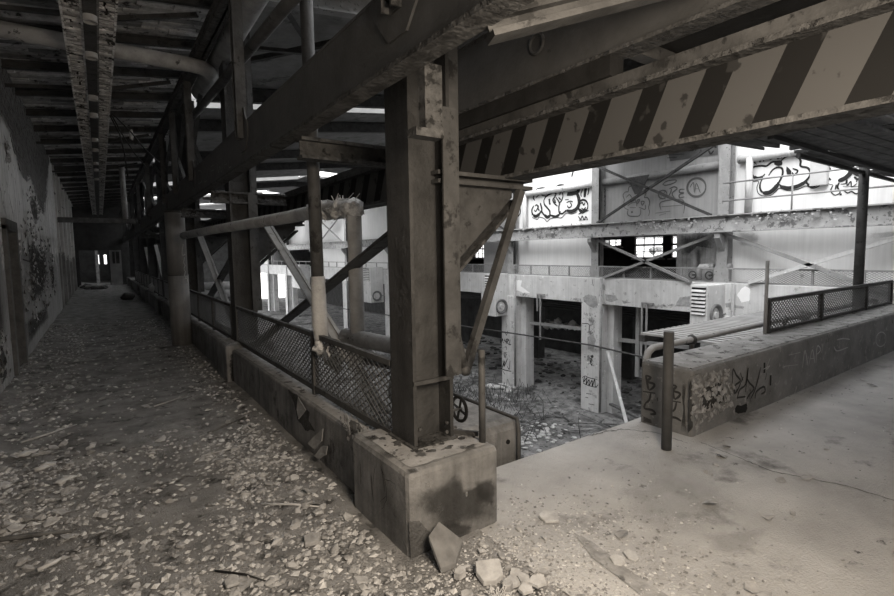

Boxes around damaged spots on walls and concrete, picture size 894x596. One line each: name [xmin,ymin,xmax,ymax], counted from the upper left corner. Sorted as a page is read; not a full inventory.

peeling [0,58,57,329]